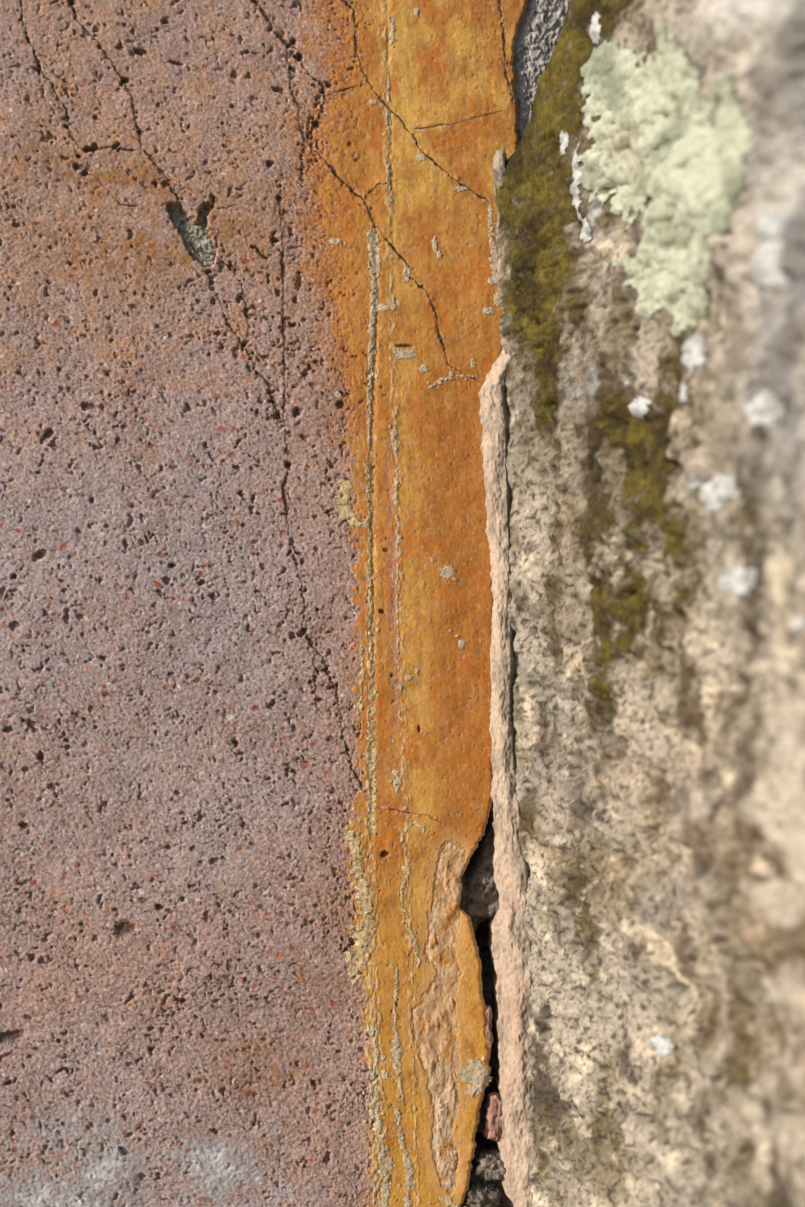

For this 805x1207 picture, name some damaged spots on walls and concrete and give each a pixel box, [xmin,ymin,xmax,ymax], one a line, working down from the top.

crack [19,0,178,207]
spalling [513,0,570,143]
spalling [167,204,216,267]
crack [206,0,513,791]
peeling [362,809,509,1207]